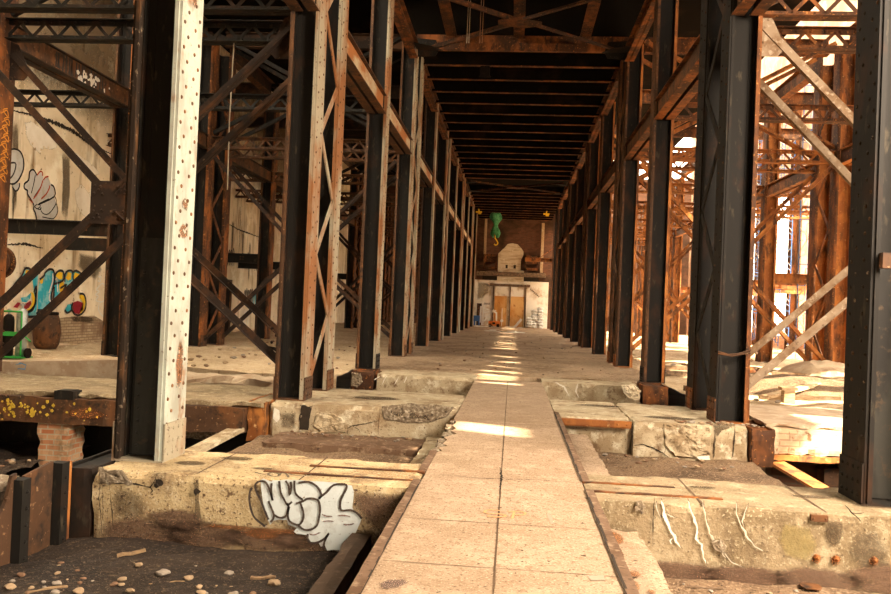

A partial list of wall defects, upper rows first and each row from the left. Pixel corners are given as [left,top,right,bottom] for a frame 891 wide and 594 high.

spalling [381,403,454,423]
leakage [656,500,891,594]